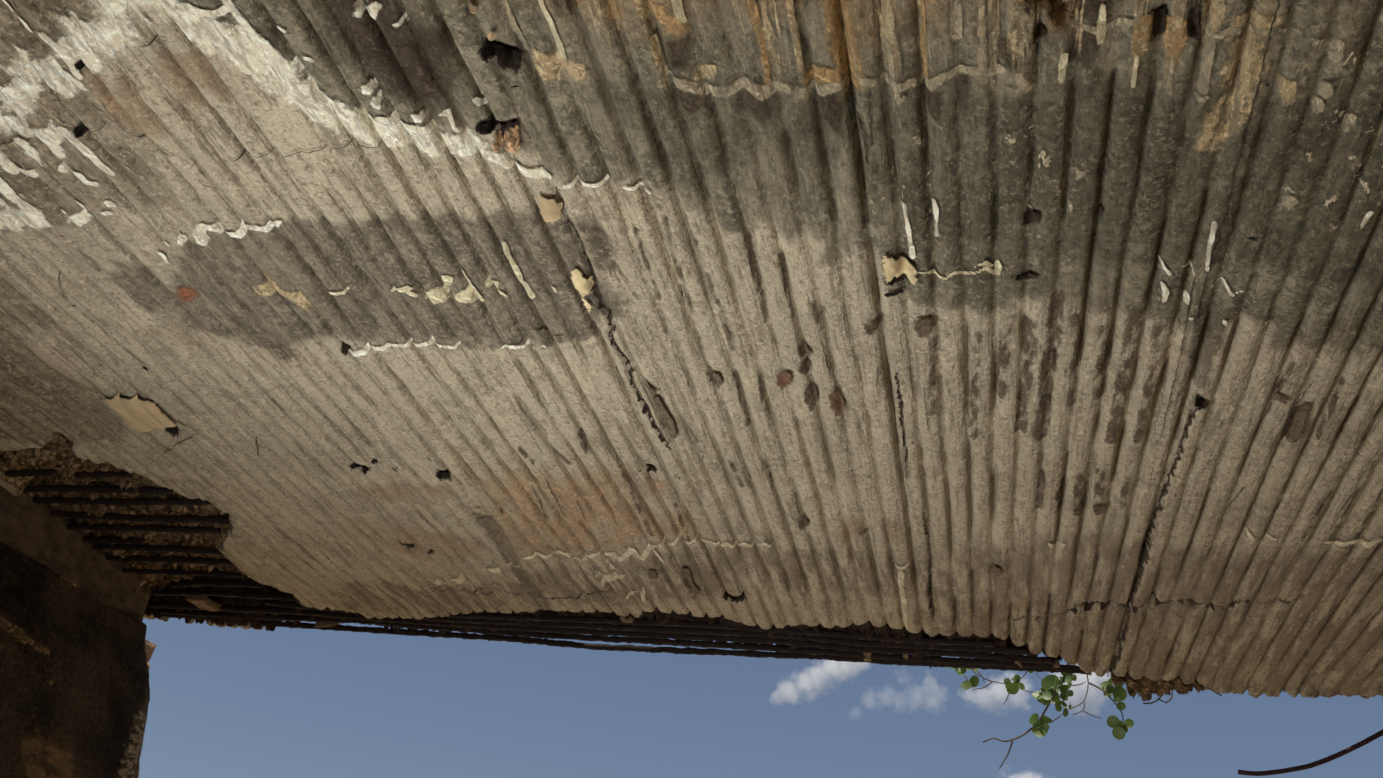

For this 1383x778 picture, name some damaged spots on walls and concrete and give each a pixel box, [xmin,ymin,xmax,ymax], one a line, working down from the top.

flaking render [491,125,521,154]
spalling [537,197,563,223]
leakage [0,0,1383,446]
rust [693,64,717,83]
rust [1132,0,1297,151]
crack [461,187,680,468]
crack [923,0,1306,669]
flaking render [102,392,176,432]
spalling [0,432,1204,702]
crack [1313,489,1383,519]